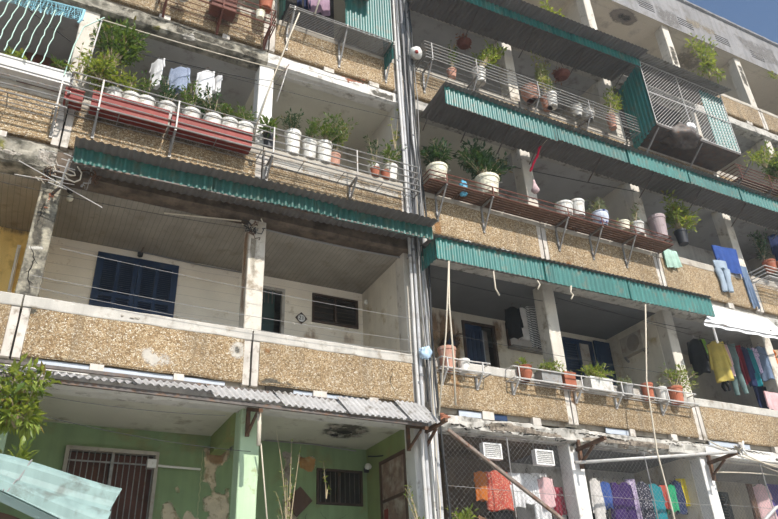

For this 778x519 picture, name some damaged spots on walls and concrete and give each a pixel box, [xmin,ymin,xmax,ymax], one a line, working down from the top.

leakage [610,9,637,25]
peeling [161,447,230,519]